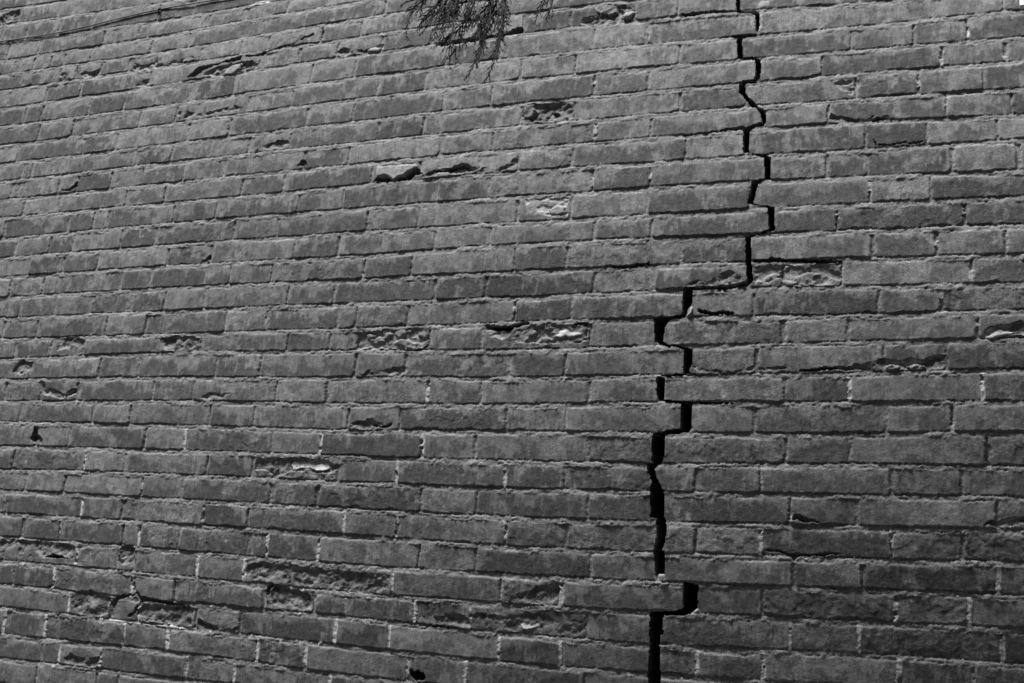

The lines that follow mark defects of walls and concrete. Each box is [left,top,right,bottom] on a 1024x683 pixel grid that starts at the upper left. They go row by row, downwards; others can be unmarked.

spalling [203,59,260,78]
spalling [520,100,576,124]
crack [681,0,843,285]
spalling [373,156,521,184]
peeling [686,263,842,291]
peeling [356,327,431,351]
peeling [483,321,590,346]
spalling [251,456,347,480]
crack [646,286,734,683]